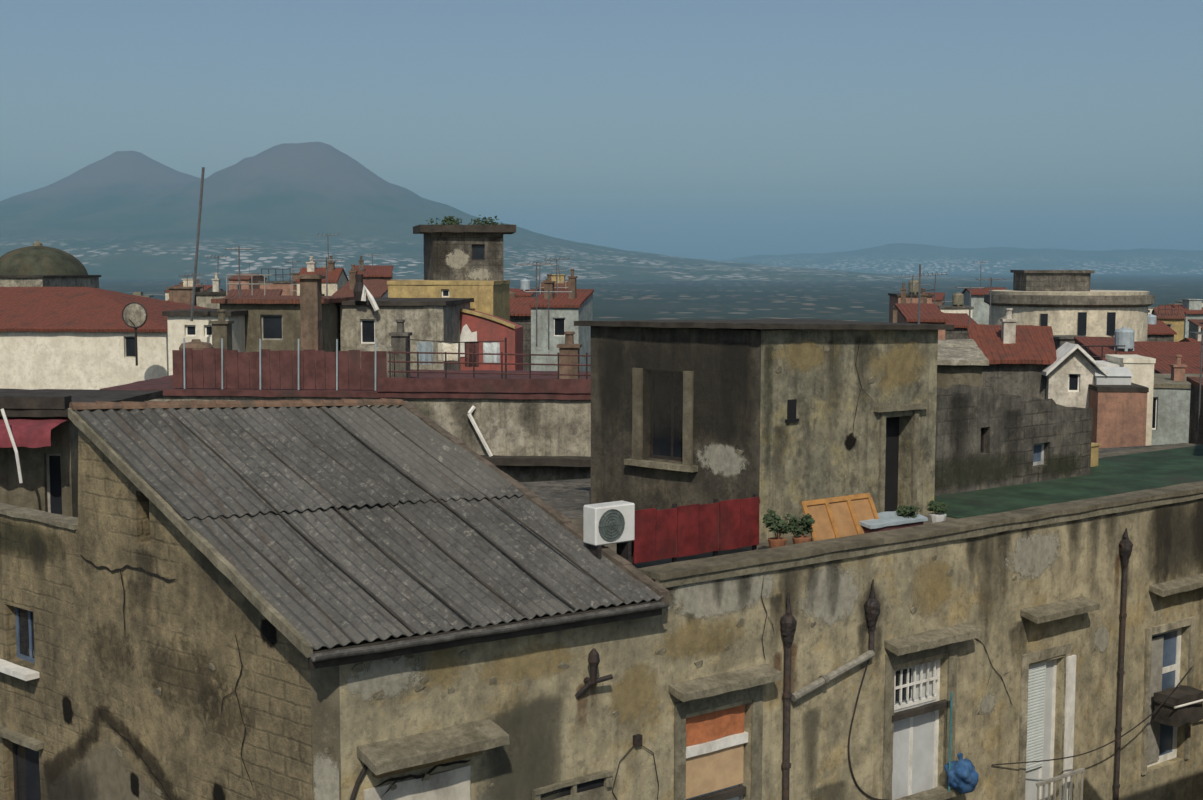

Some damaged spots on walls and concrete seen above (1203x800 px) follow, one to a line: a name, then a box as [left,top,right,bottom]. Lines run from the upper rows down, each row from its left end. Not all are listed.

flaking render [697,444,747,476]
water stain [969,537,977,560]
crack [79,554,176,633]
crack [221,635,254,791]